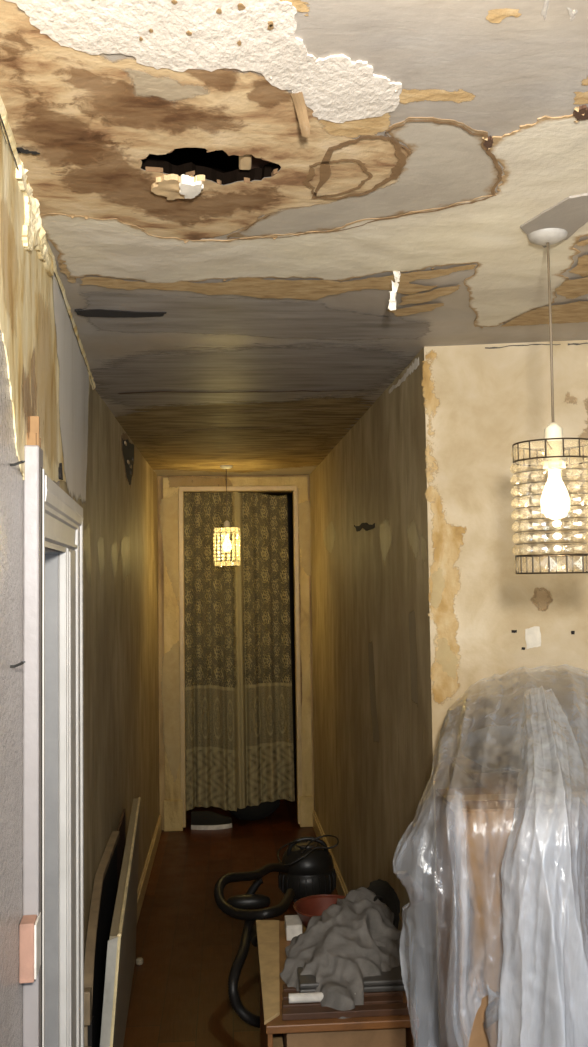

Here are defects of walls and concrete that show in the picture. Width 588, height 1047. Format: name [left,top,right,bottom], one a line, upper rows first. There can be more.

peeling [5,0,475,138]
damp [0,0,503,240]
flaking render [486,8,522,23]
peeling [0,77,588,502]
peeling [380,520,392,562]
flaking render [407,351,467,704]